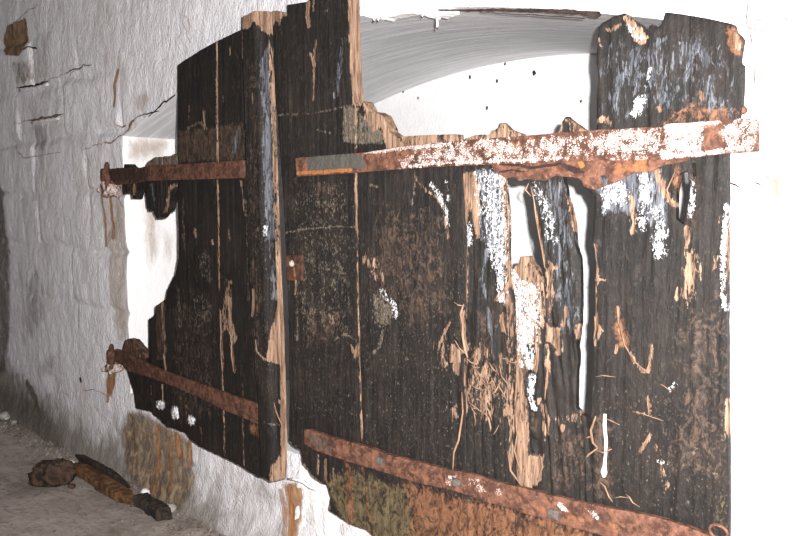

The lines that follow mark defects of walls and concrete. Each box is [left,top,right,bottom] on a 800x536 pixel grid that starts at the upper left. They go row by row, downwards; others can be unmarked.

spalling [4,5,37,56]
crack [17,64,90,92]
crack [13,114,63,124]
crack [82,94,175,150]
rust [101,195,119,247]
rust [106,372,116,403]
damp [122,413,194,510]
rust [285,483,303,536]